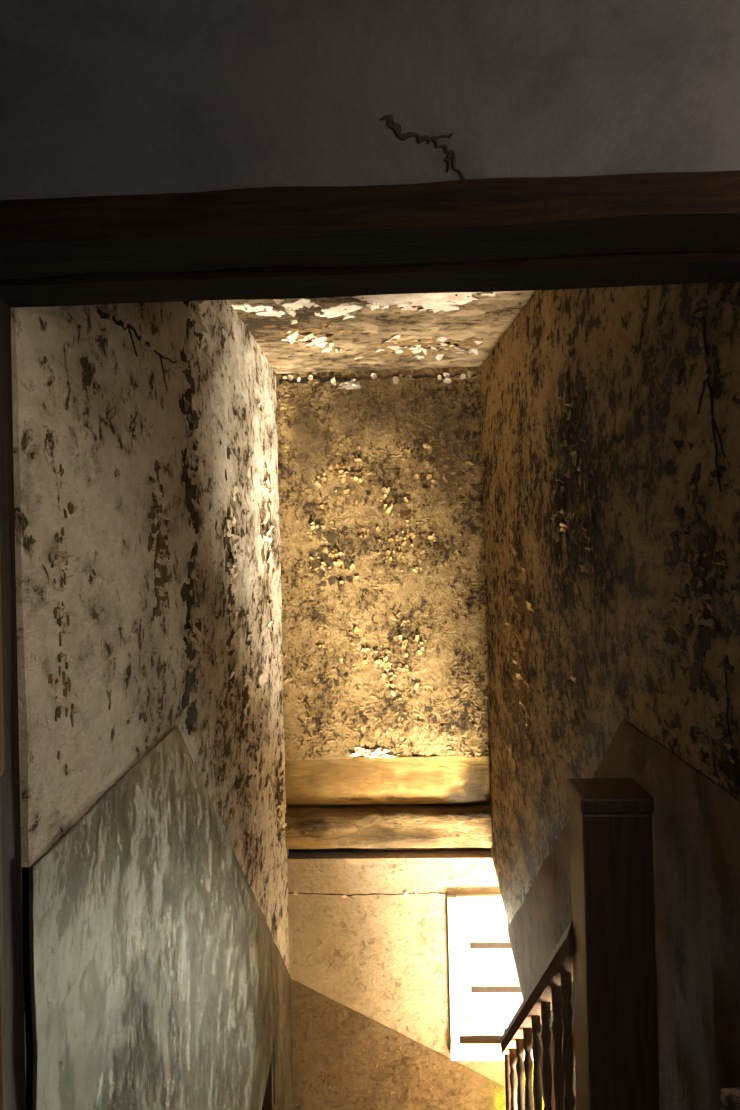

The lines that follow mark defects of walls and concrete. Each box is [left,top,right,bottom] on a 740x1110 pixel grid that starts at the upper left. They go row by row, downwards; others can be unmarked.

crack [381,115,466,180]
spalling [231,292,497,361]
water stain [546,378,611,682]